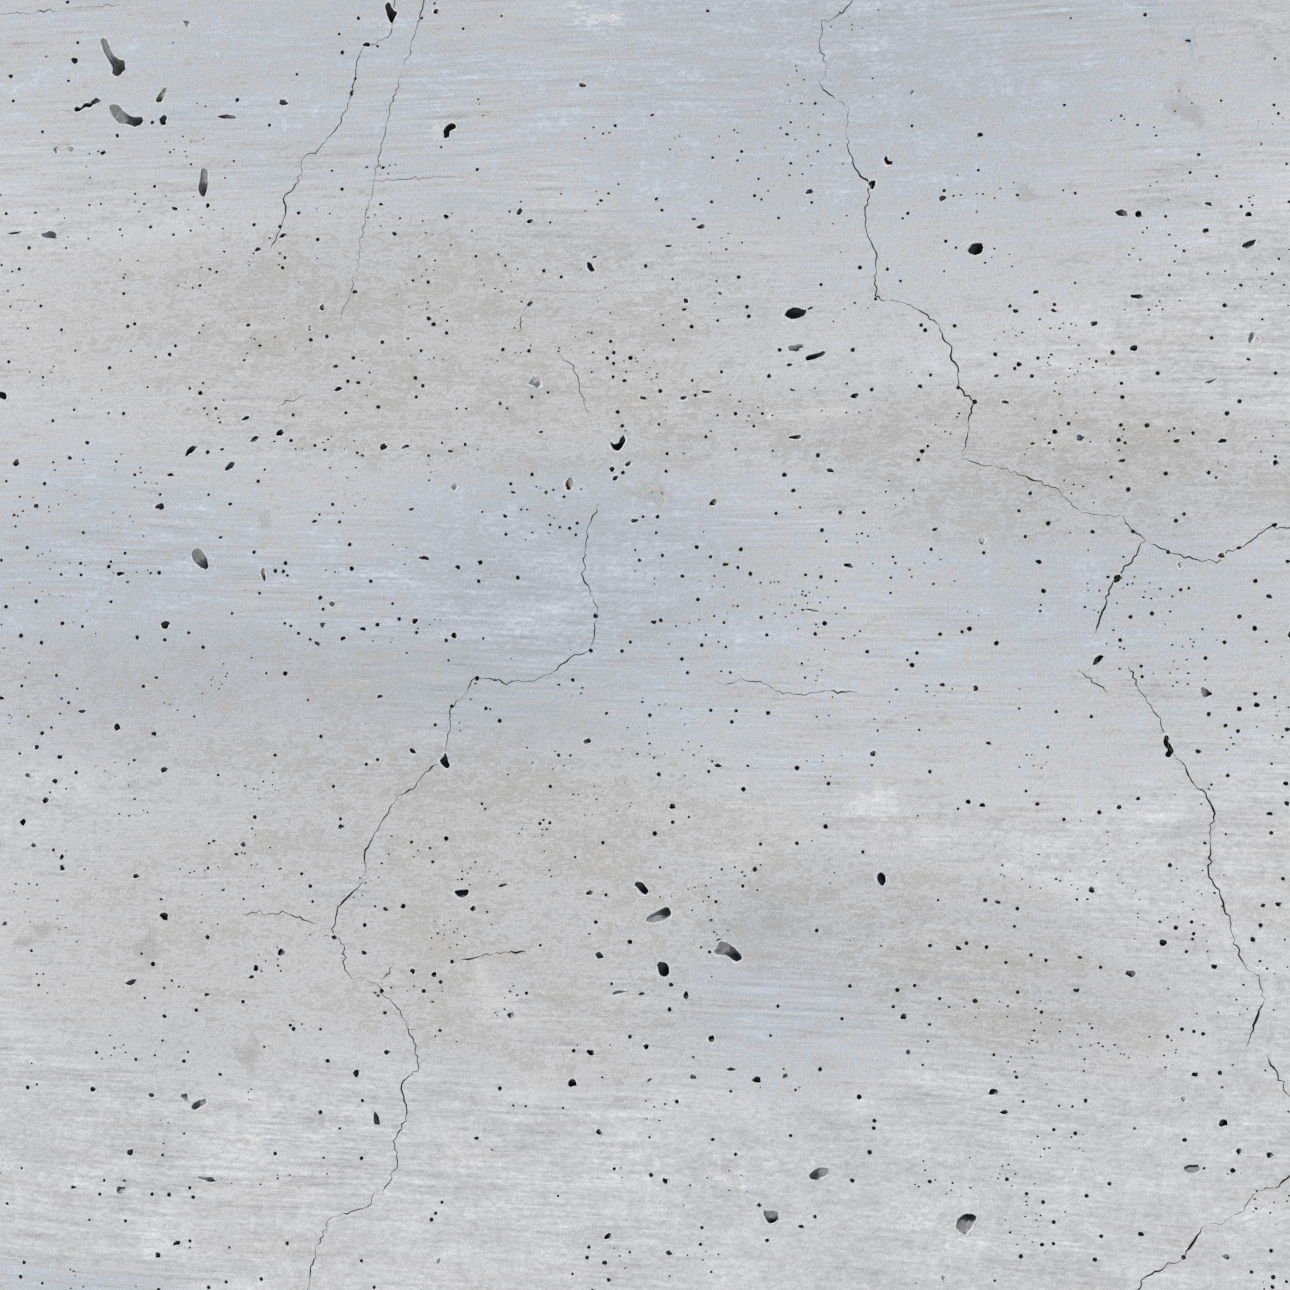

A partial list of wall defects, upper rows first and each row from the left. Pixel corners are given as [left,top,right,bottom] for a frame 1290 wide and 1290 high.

crack [270,0,411,248]
crack [819,1,1290,634]
crack [242,504,599,1290]
crack [1081,666,1290,1097]
crack [1137,1175,1290,1290]